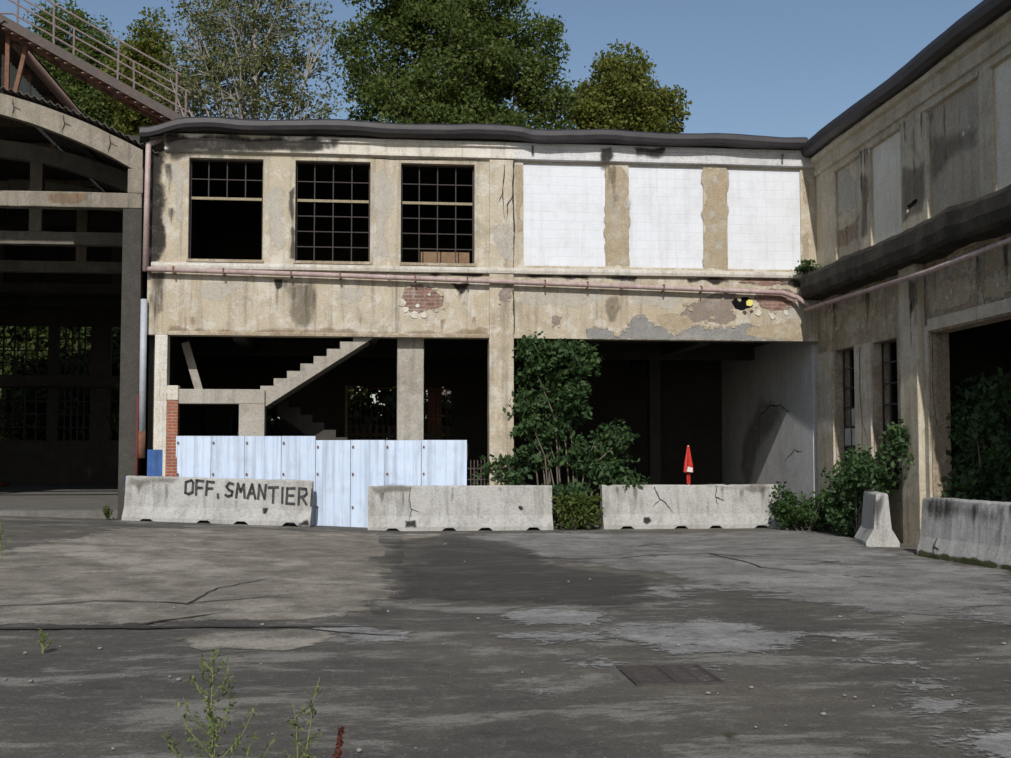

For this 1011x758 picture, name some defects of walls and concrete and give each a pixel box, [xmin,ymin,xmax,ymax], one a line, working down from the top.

peeling [603,164,631,266]
peeling [701,167,729,270]
spalling [398,283,445,318]
peeling [586,278,807,341]
water stain [928,500,957,516]